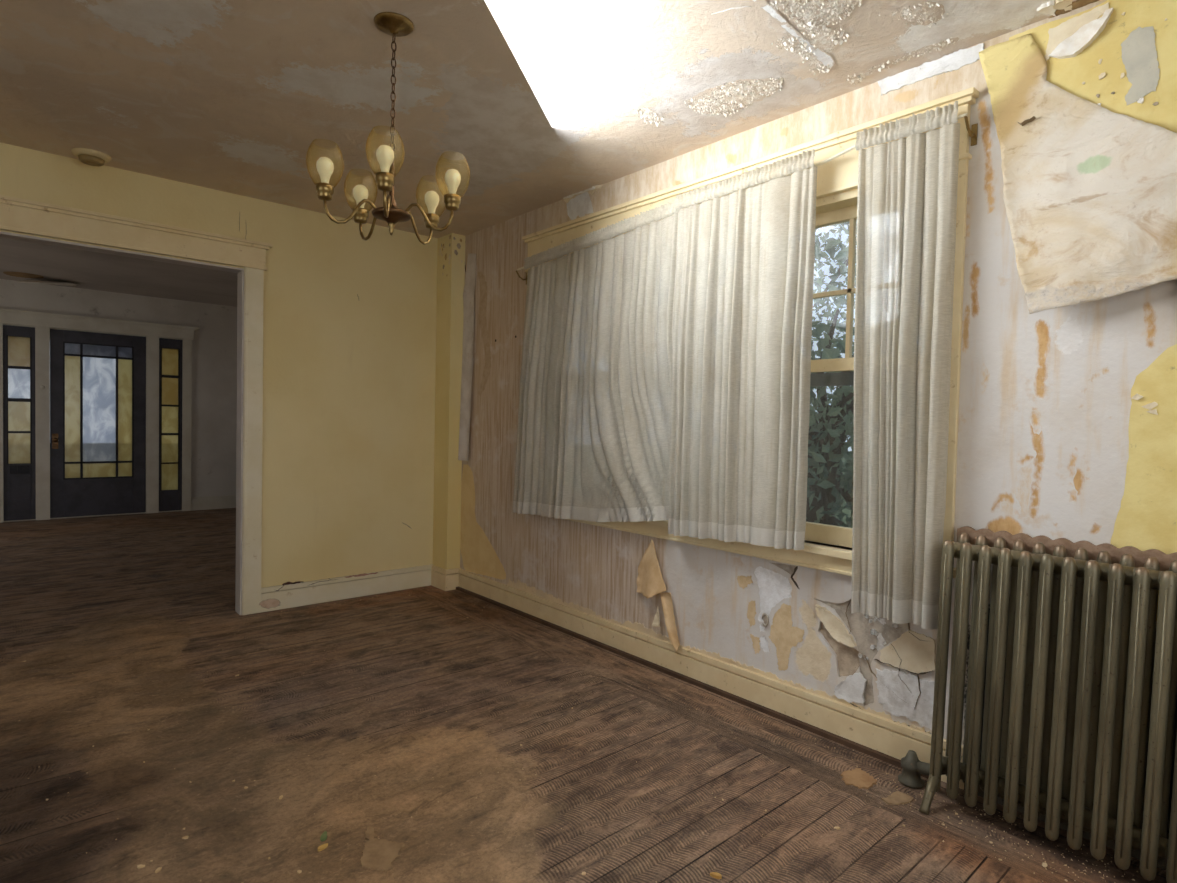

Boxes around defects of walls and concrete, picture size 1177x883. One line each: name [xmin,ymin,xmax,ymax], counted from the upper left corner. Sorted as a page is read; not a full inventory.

peeling [1121,26,1160,105]
water stain [961,98,997,400]
water stain [976,318,1092,540]
peeling [636,539,680,652]
flaking render [737,565,936,730]